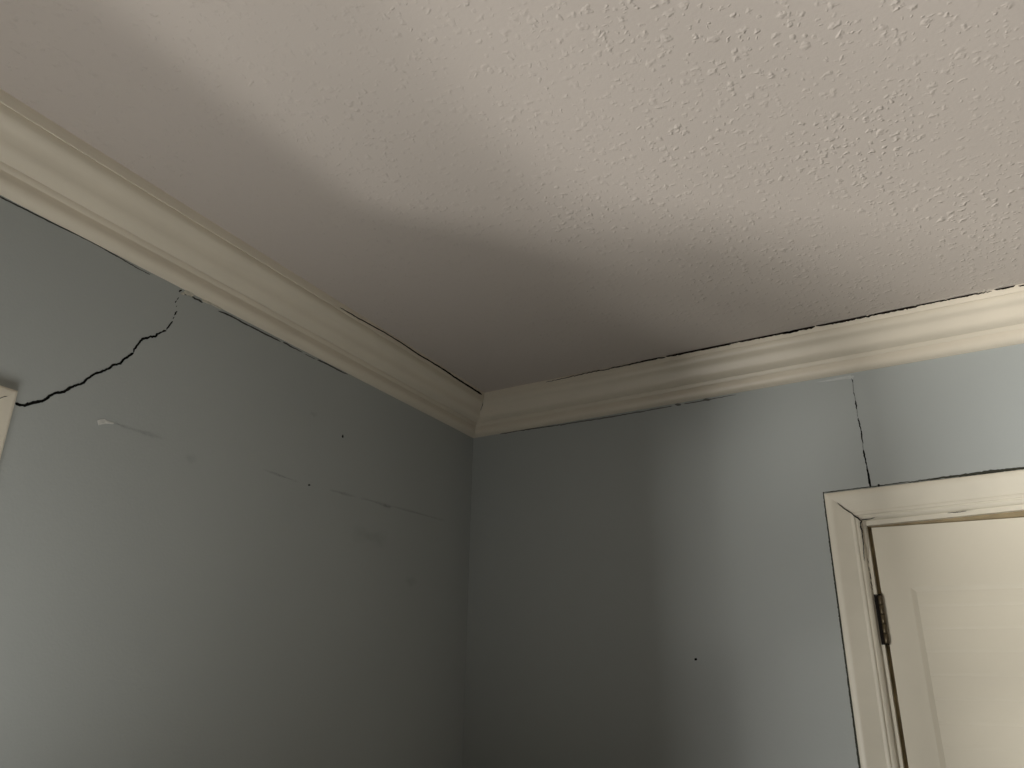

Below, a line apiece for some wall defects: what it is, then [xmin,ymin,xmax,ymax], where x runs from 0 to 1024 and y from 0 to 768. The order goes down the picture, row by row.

crack [0,196,150,275]
crack [1,290,347,407]
crack [341,308,483,408]
crack [548,283,1024,382]
crack [823,378,1024,768]